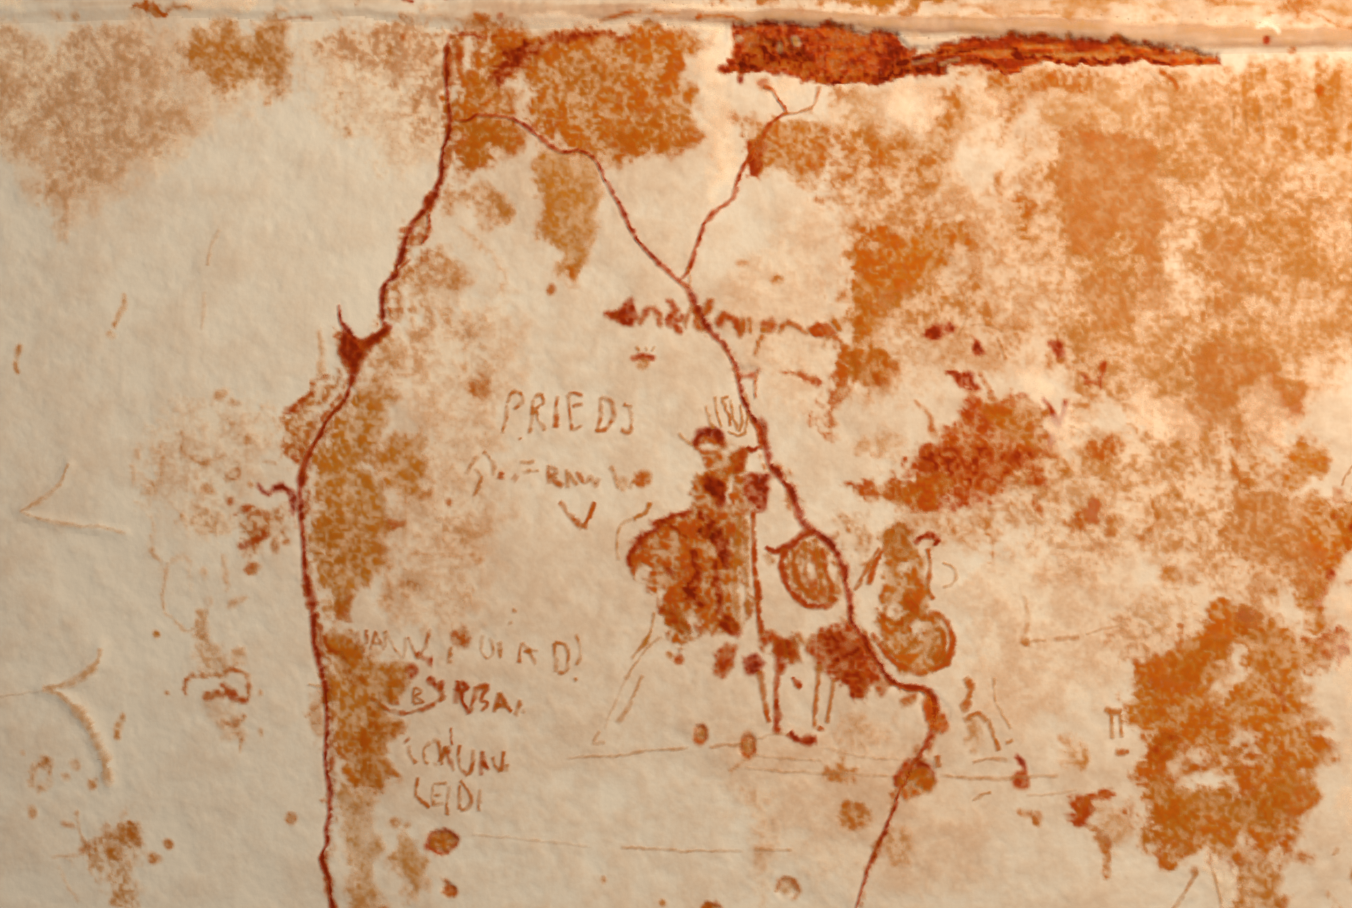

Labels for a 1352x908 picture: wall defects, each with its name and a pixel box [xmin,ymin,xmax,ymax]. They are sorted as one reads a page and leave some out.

corrosion [443,13,705,176]
crack [298,37,949,908]
flaking render [648,5,1221,89]
leakage [731,62,1352,908]